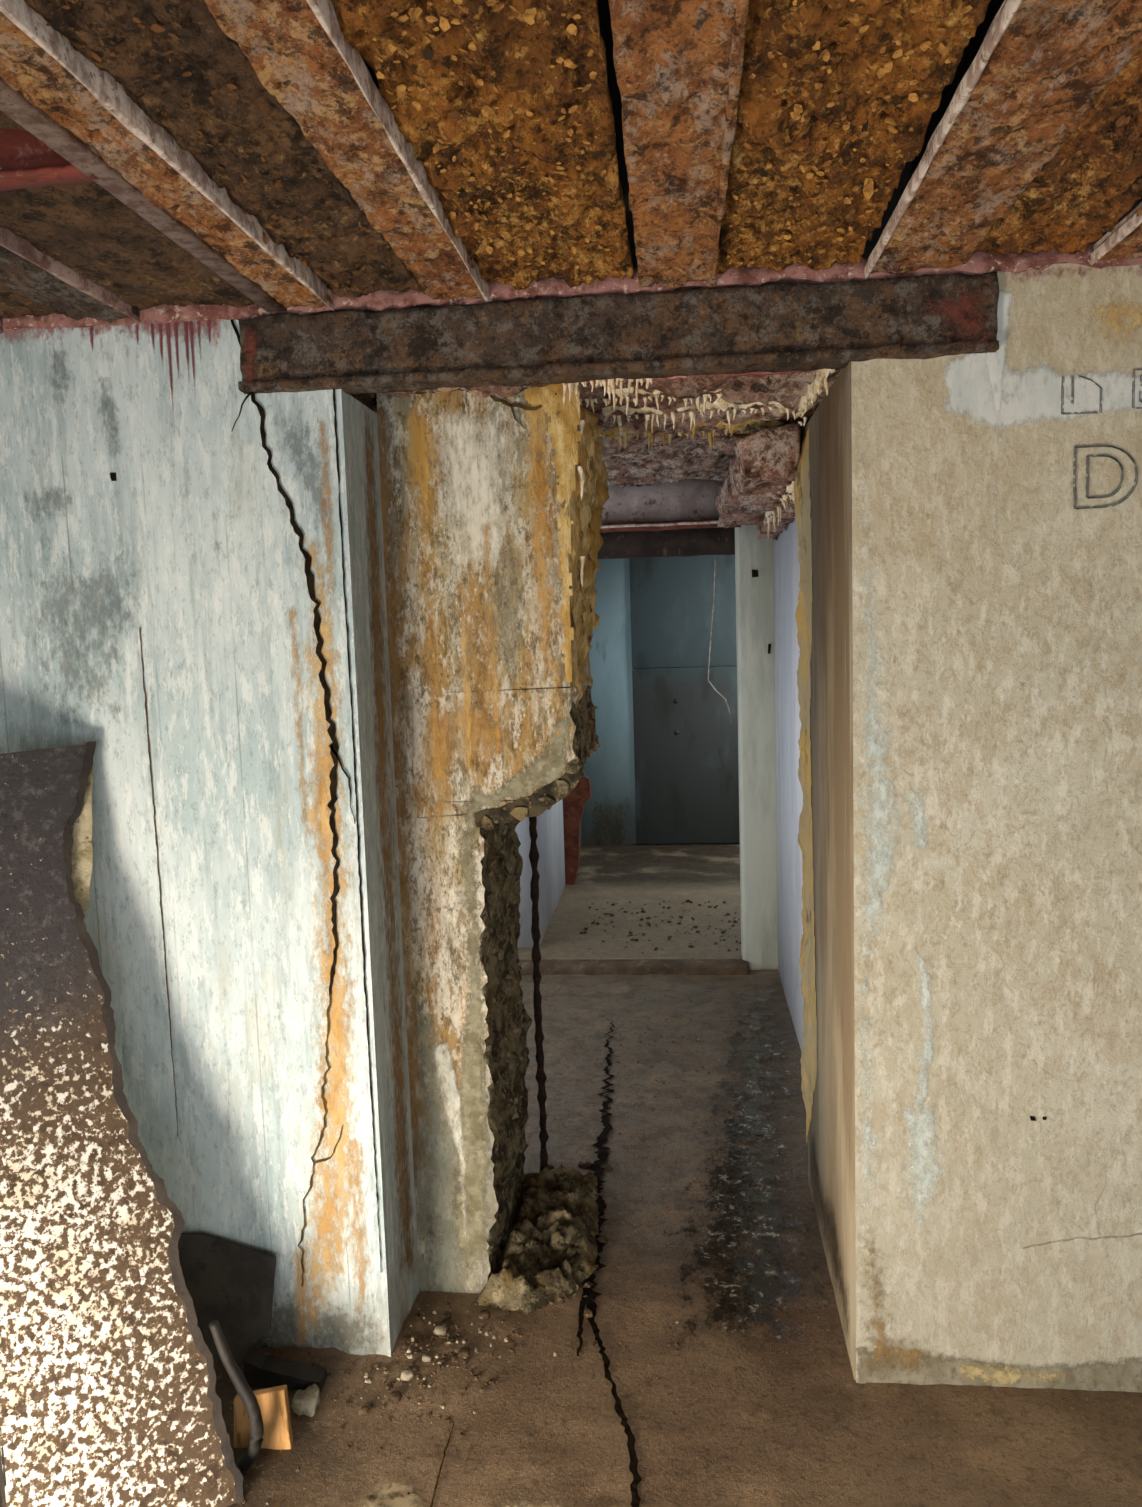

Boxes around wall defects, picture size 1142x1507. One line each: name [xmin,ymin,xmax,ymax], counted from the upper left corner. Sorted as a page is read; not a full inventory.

crack [230,319,240,345]
crack [231,389,382,1287]
rust [293,425,370,1348]
rust [365,409,420,1273]
rust [424,526,504,835]
water stain [437,408,514,580]
spalling [452,719,584,1269]
rust [525,408,562,700]
water stain [525,369,848,1326]
crack [430,1422,454,1507]
crack [577,1019,642,1507]
water stain [857,1249,1142,1393]